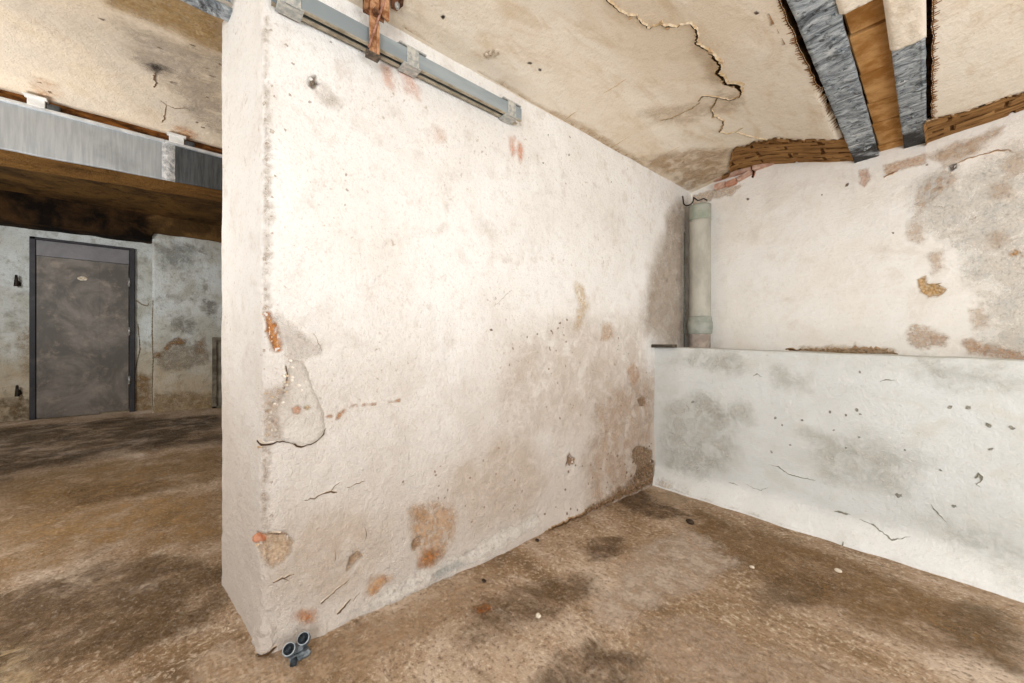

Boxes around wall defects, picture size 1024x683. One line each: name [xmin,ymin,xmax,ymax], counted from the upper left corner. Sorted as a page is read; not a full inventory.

water stain [110,0,224,126]
crack [606,0,768,140]
flaking render [693,0,872,204]
water stain [938,132,998,161]
peeling [885,0,1024,359]
flaking render [262,305,281,352]
crack [305,481,364,501]
crack [729,464,812,491]
flaking render [252,532,293,565]
crack [834,510,905,541]
crack [320,550,360,615]